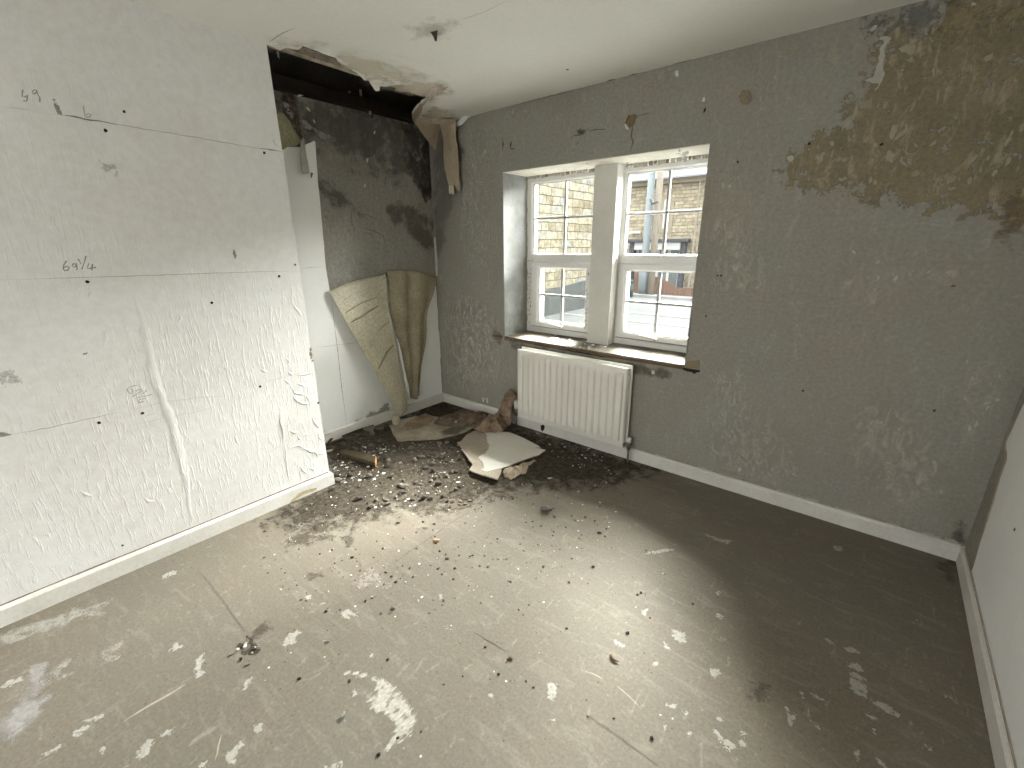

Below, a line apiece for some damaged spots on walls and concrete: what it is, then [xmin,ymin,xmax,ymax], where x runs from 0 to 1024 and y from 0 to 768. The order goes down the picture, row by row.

damp [275,92,433,247]
flaking render [772,0,1024,238]